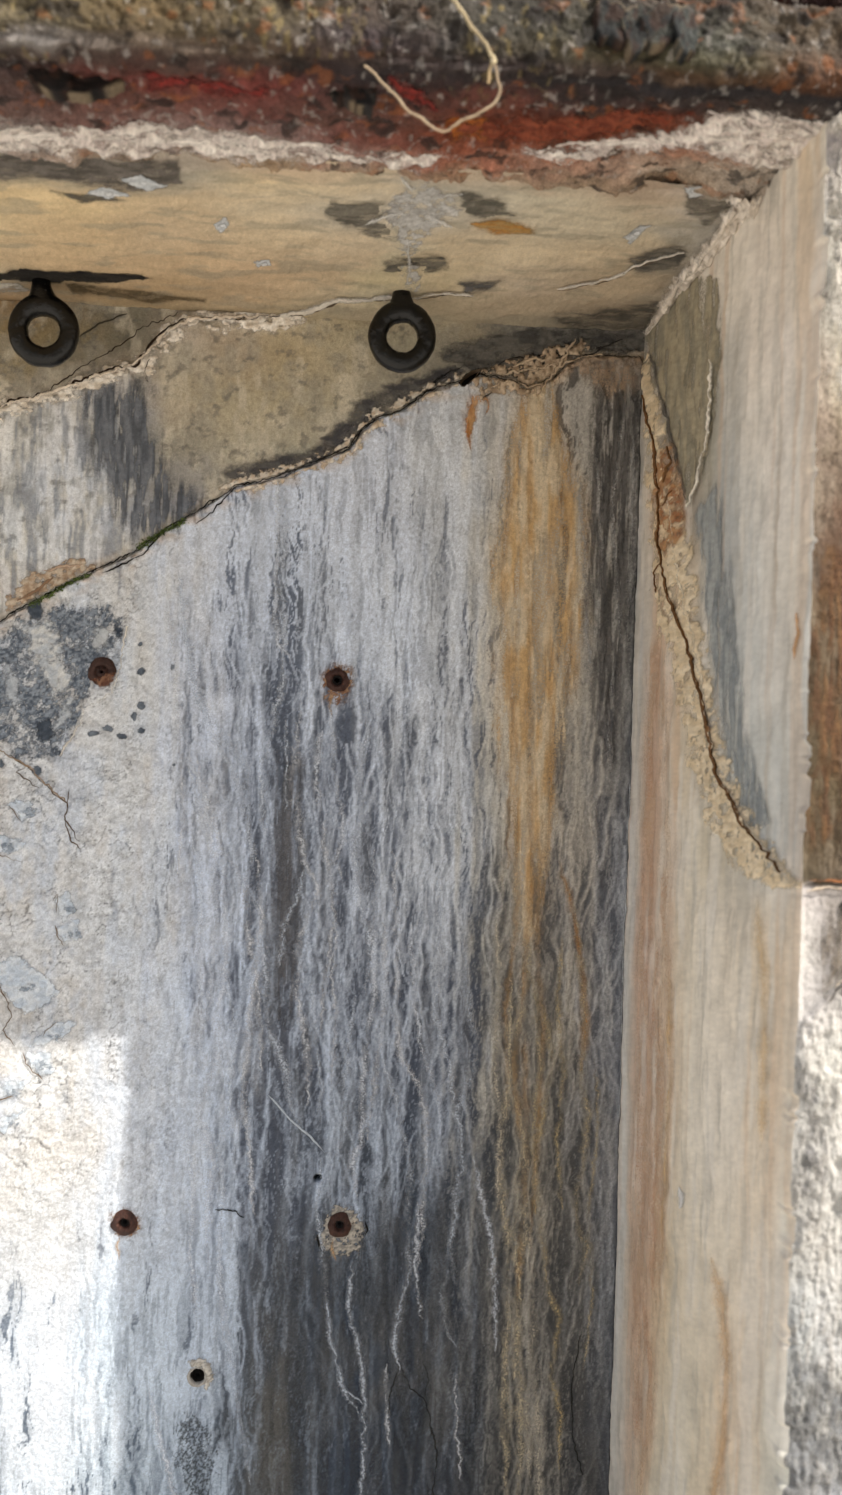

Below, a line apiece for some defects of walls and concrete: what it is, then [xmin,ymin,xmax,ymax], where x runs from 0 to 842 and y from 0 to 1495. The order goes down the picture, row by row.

peeling [26,67,125,104]
peeling [326,85,377,119]
peeling [591,0,698,66]
crack [2,293,472,408]
corrosion [465,396,489,449]
corrosion [92,671,116,687]
crack [0,339,842,891]
corrosion [490,378,586,946]
water stain [578,378,638,818]
water stain [166,581,599,1495]